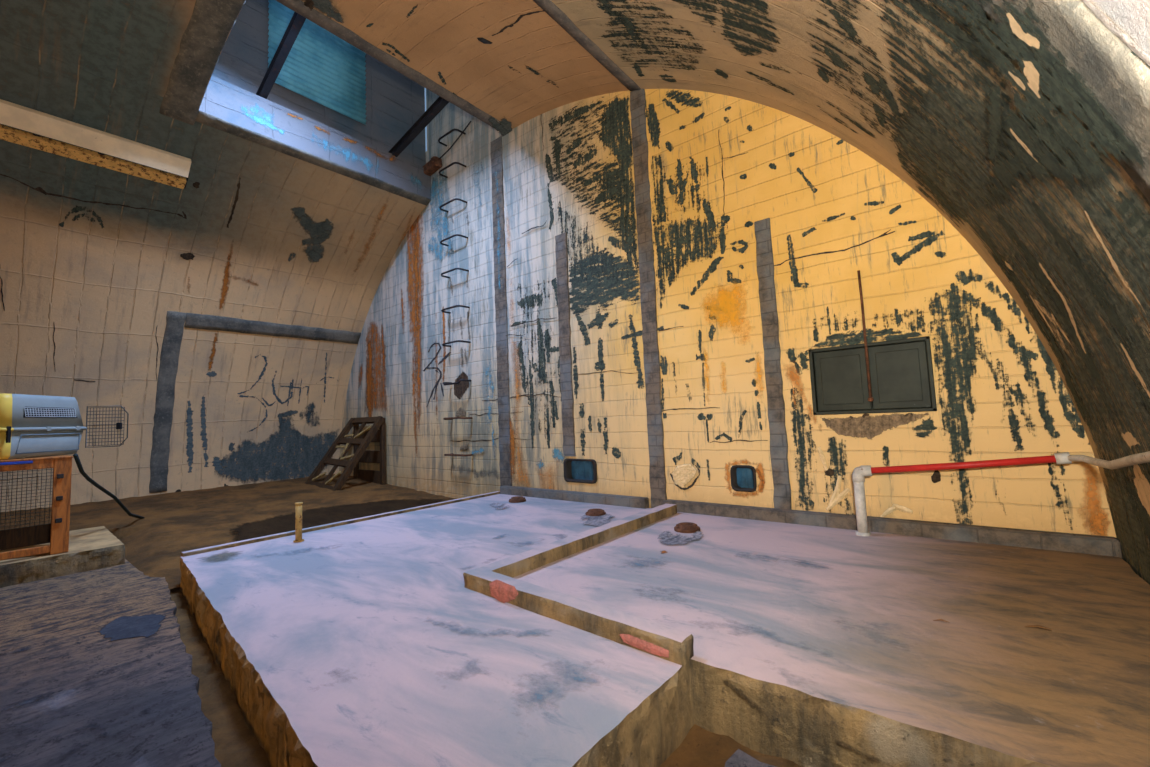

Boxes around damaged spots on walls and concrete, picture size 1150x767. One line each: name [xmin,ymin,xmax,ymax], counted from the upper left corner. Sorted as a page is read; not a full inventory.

peeling [597,0,802,309]
corrosion [220,247,257,309]
leakage [186,395,337,483]
corrosion [358,323,387,417]
corrosion [400,216,446,450]
peeling [511,96,644,458]
peeling [660,356,692,418]
corrosion [725,460,765,496]
peeling [752,379,762,430]
peeling [787,0,1150,585]
leakage [98,614,166,642]
spalling [489,580,518,603]